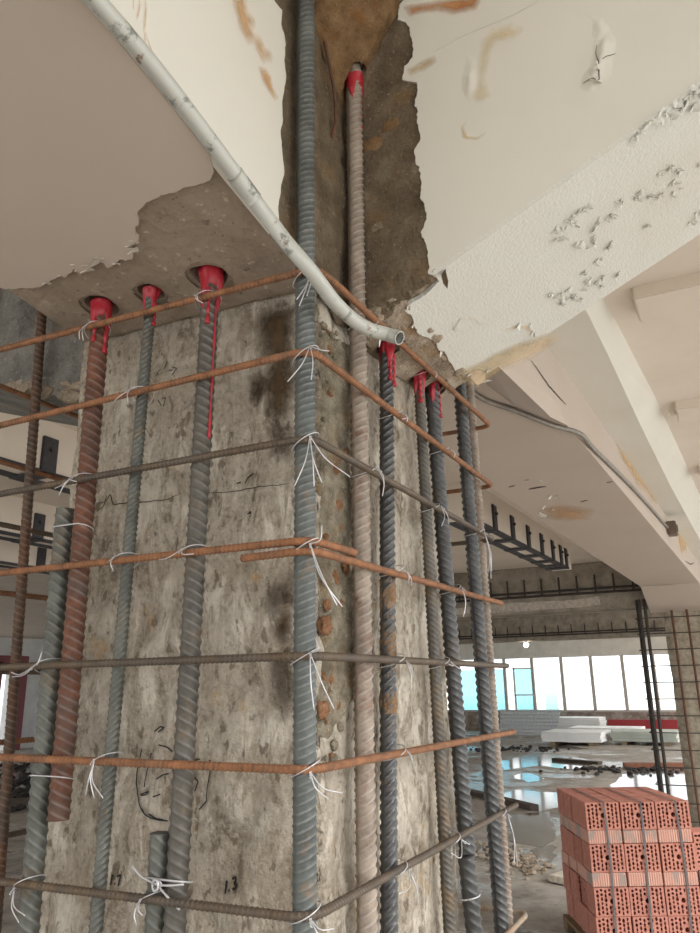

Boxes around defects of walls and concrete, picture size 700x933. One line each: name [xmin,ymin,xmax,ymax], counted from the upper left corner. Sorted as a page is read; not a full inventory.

peeling [630,83,700,143]
peeling [549,165,685,306]
crack [96,494,179,510]
crack [213,484,282,493]
spalling [0,0,514,933]